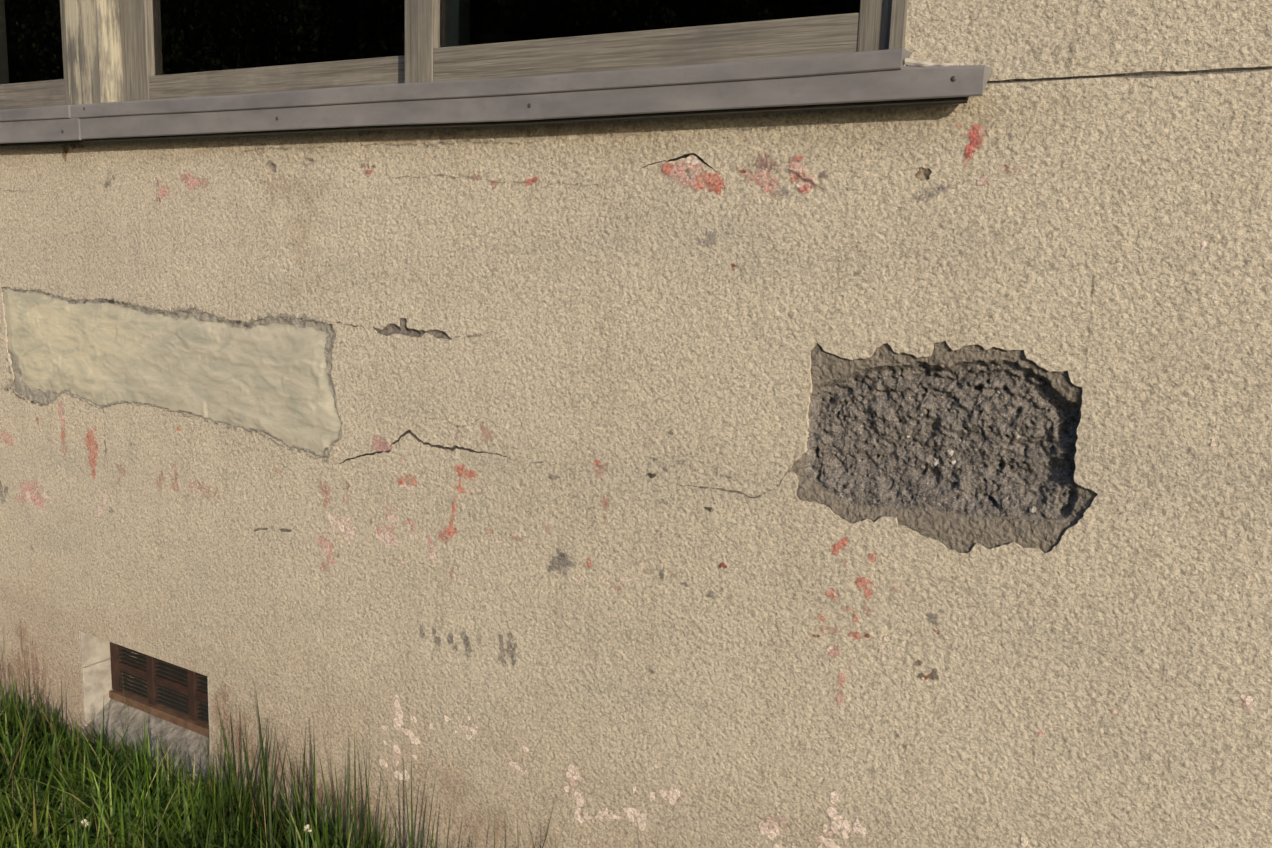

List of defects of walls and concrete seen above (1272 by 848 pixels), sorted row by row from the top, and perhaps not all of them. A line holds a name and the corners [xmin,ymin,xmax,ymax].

peeling [642,153,725,194]
peeling [738,153,828,197]
spalling [1,287,452,458]
crack [324,430,517,464]
spalling [680,341,1098,553]
peeling [316,482,438,571]
peeling [832,537,849,567]
peeling [813,577,888,704]